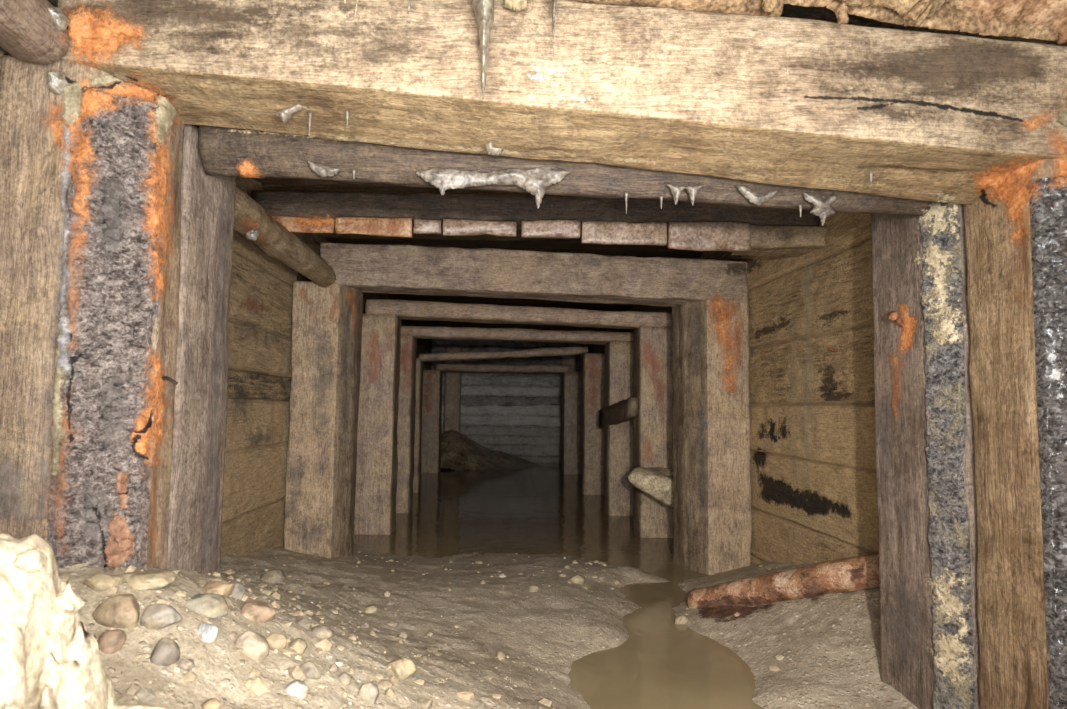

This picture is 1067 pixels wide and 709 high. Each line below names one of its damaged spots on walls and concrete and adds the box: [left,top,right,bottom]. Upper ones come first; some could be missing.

rust [67,6,142,68]
water stain [65,0,265,52]
water stain [270,6,334,55]
water stain [358,27,412,62]
crack [804,95,1023,122]
rust [46,80,174,297]
rust [975,159,1043,240]
rust [1053,133,1067,187]
rust [708,295,743,392]
rust [891,304,917,416]
rust [145,353,165,559]
water stain [753,419,851,520]